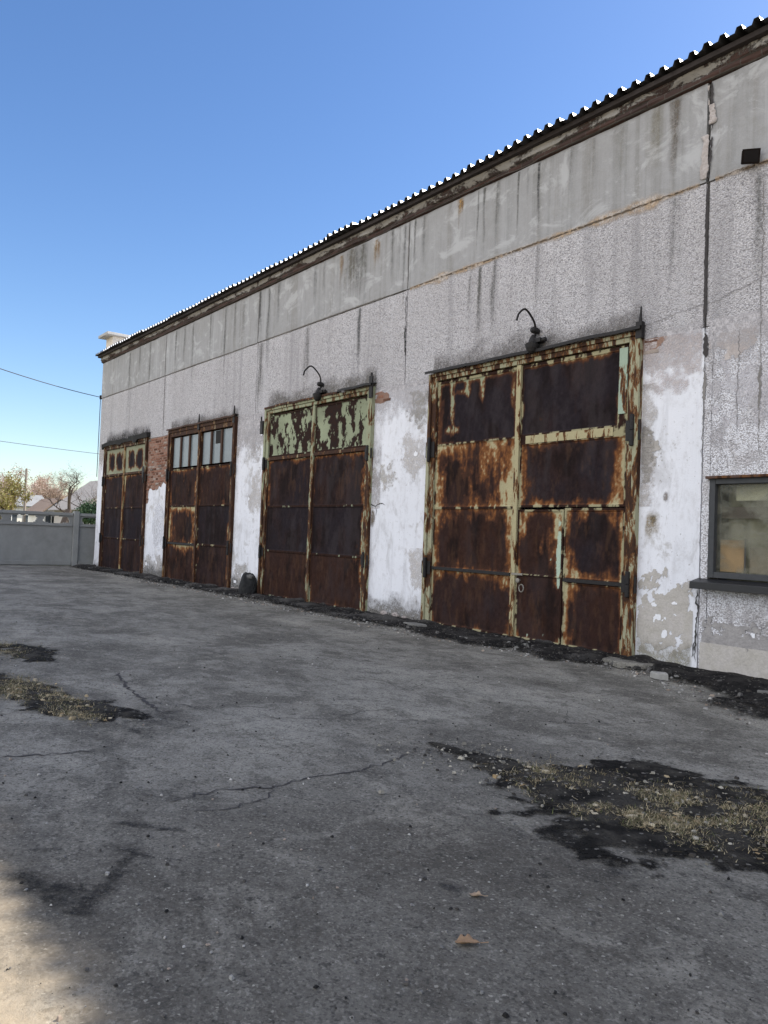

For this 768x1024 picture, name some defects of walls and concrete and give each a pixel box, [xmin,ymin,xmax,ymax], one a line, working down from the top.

spalling [146,435,168,503]
peeling [372,390,428,490]
flaking render [640,333,702,507]
peeling [409,548,423,588]
crack [173,751,417,811]